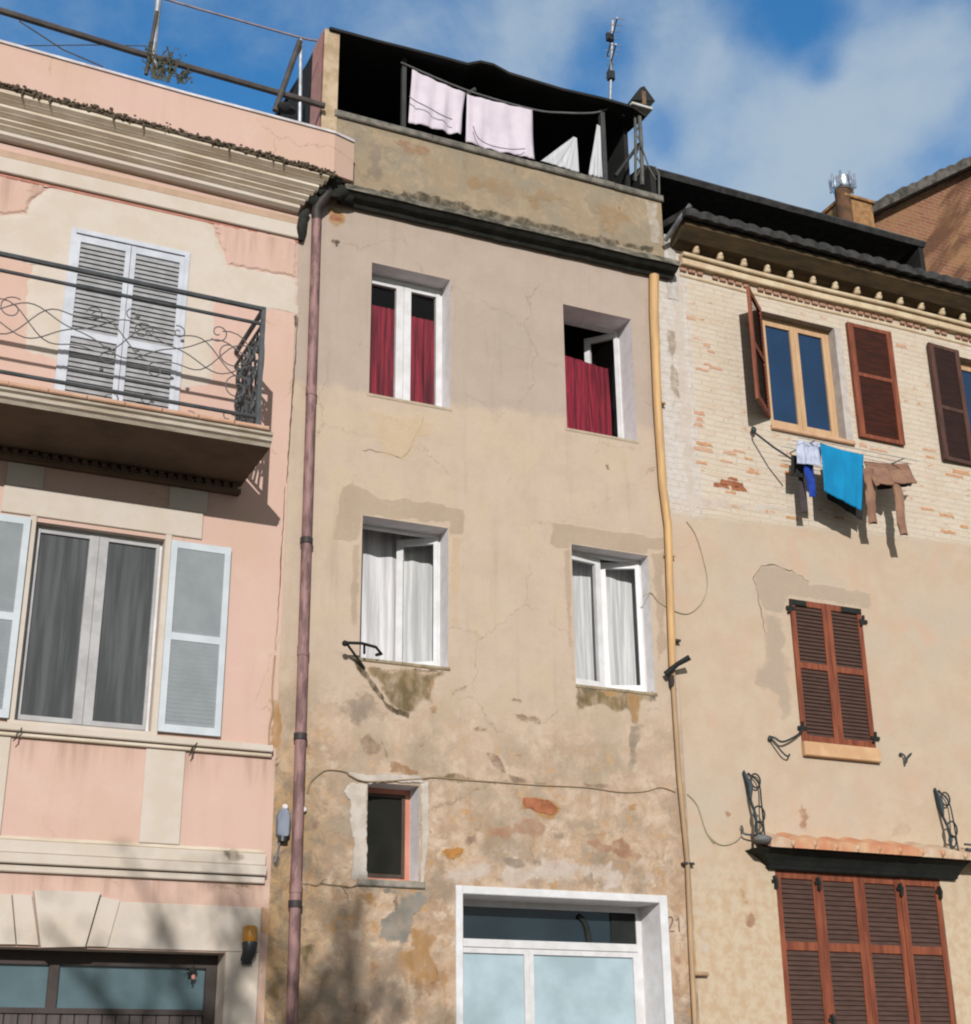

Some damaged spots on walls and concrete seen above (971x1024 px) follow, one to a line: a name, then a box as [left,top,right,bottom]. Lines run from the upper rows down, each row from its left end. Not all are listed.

peeling [0,176,48,214]
leakage [368,140,653,252]
peeling [214,224,297,277]
flaking render [693,441,760,495]
leakage [341,658,443,725]
peeling [755,615,791,718]
leakage [576,687,655,766]
flaking render [522,797,561,819]
peeling [442,828,644,891]